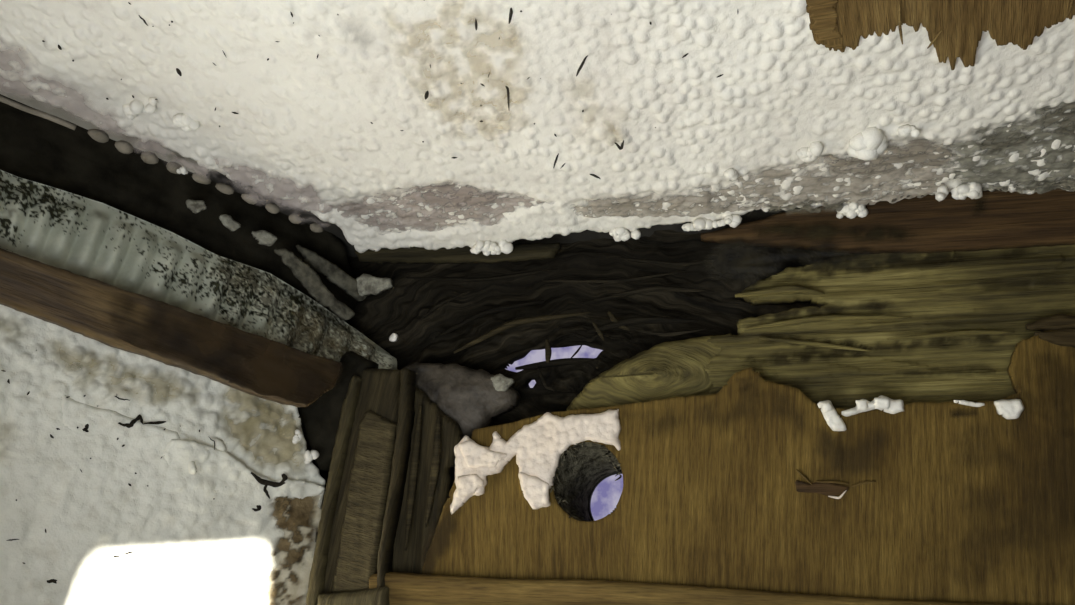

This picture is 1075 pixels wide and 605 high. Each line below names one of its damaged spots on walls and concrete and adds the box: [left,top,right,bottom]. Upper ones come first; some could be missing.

water stain [0,52,124,132]
water stain [0,170,88,247]
water stain [179,160,332,213]
spalling [331,102,1075,426]
water stain [106,207,362,467]
peeling [456,440,507,497]
peeling [519,472,550,509]